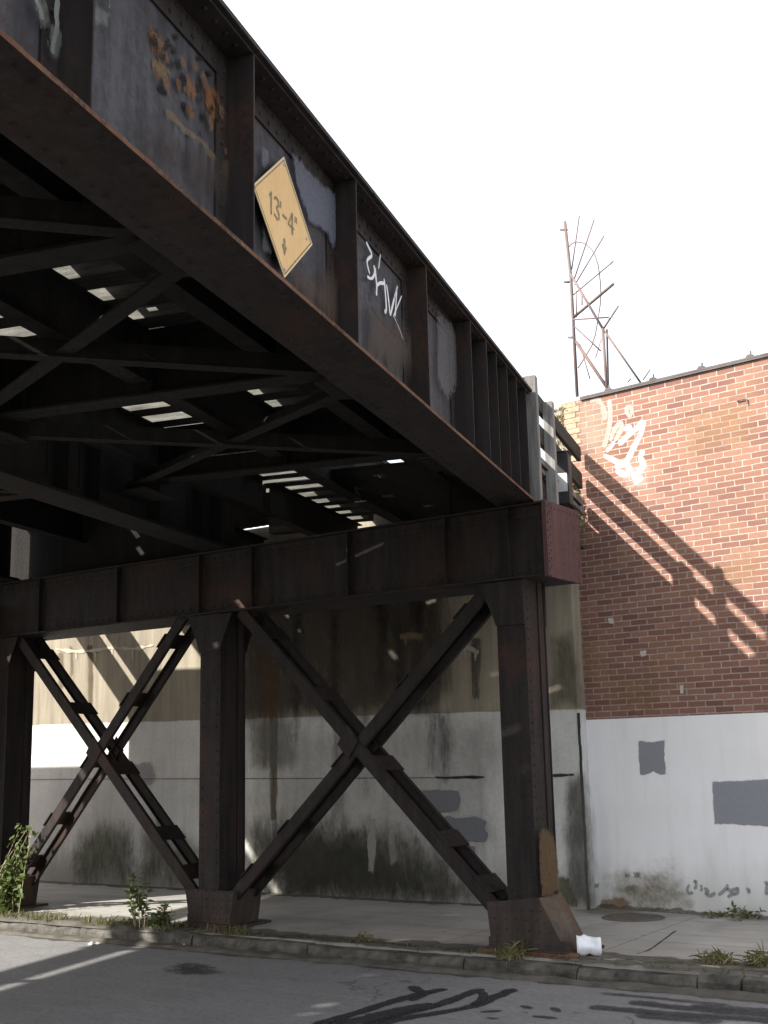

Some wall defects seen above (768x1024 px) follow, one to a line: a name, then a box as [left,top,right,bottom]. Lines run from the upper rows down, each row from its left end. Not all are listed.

rust [149,26,224,131]
water stain [245,634,316,719]
water stain [270,599,442,714]
water stain [253,822,278,862]
water stain [269,819,468,898]
rust [539,828,560,896]
water stain [567,778,768,920]